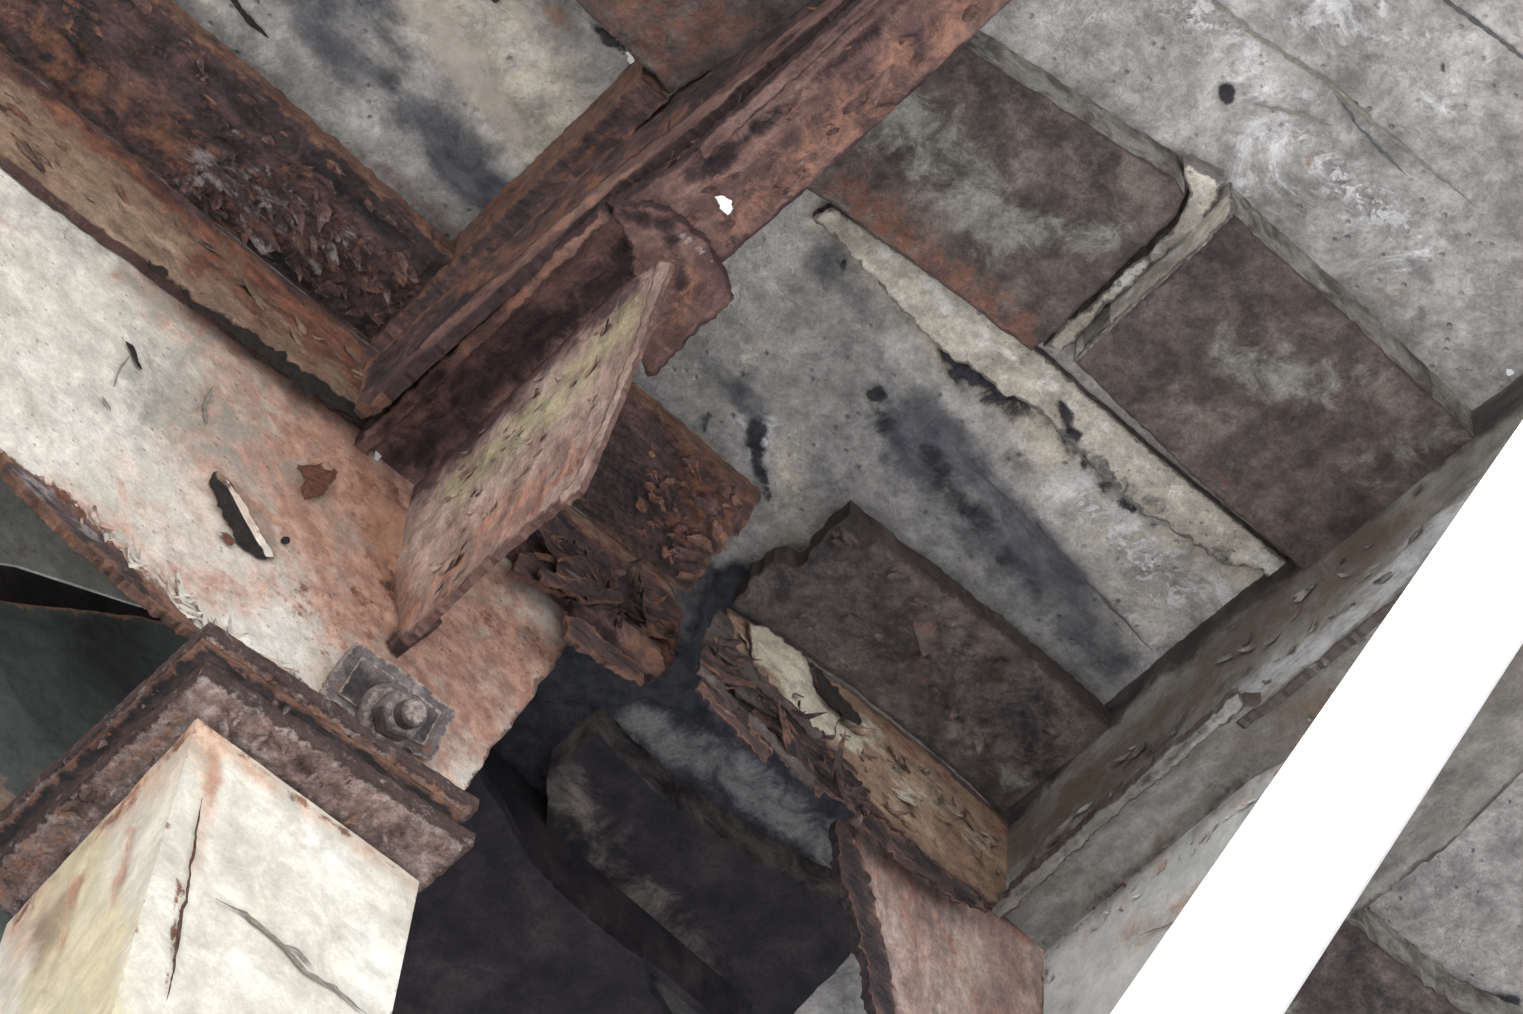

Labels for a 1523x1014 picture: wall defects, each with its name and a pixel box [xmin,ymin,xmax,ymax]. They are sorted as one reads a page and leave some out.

damp [295,0,526,209]
peeling [190,289,242,325]
damp [717,374,761,418]
corrosion [297,460,337,499]
peeling [220,532,235,546]
damp [871,395,1129,674]
corrosion [209,752,221,788]
crack [166,800,367,1014]